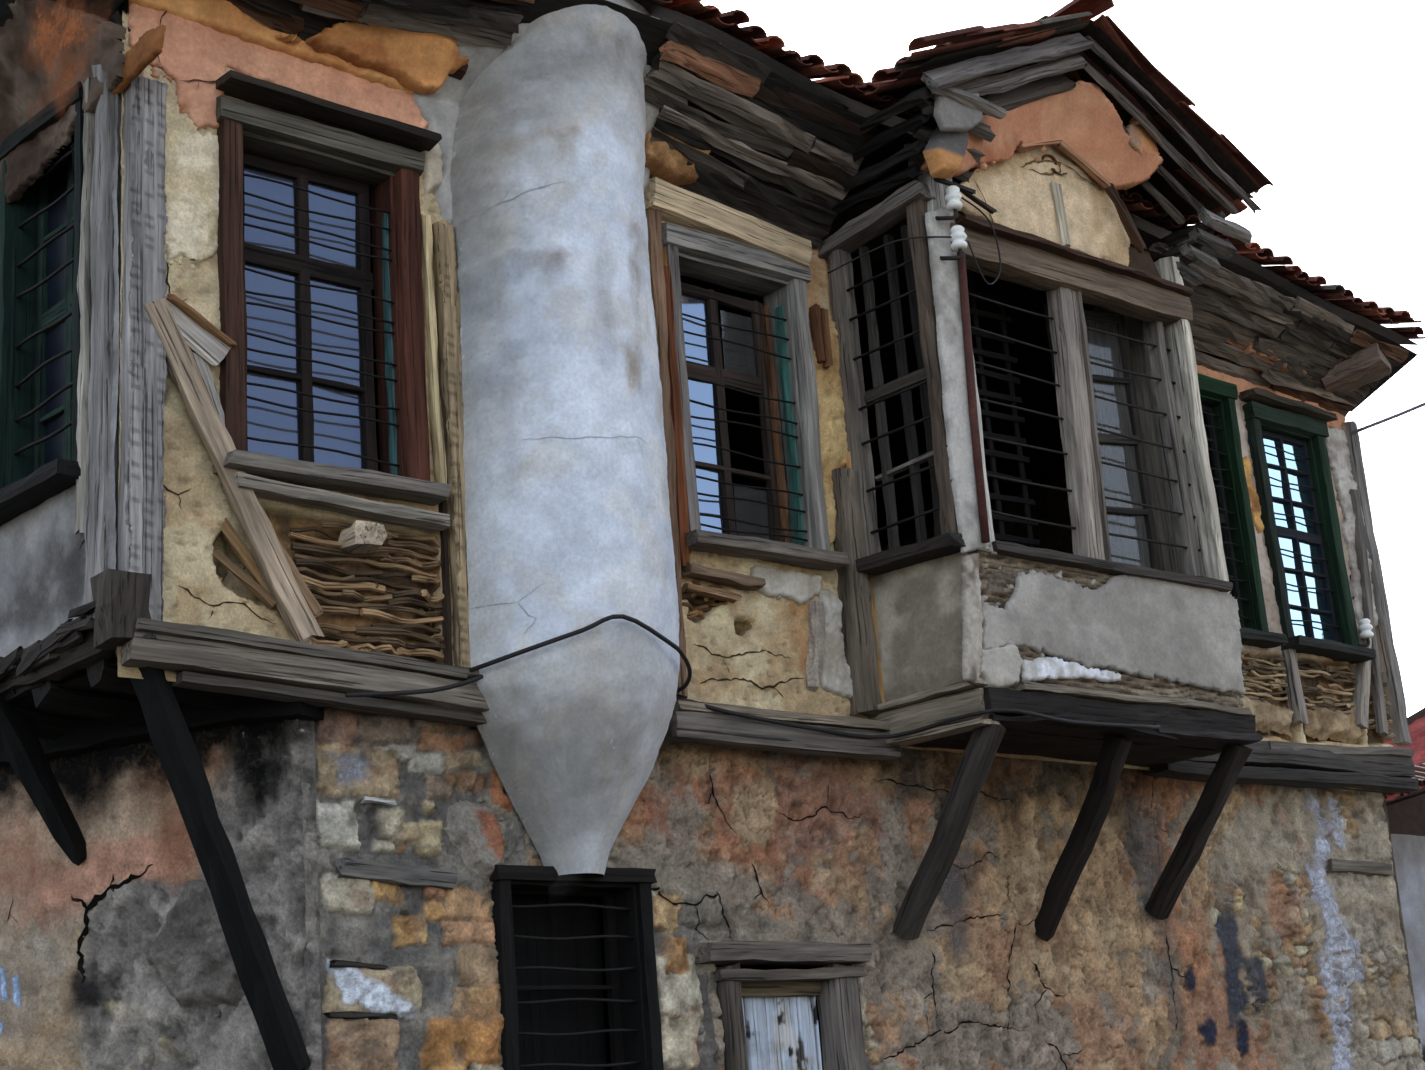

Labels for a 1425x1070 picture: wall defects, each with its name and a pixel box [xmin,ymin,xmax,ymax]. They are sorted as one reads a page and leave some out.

peeling [127,3,469,270]
peeling [645,130,711,187]
peeling [953,81,1163,190]
crack [178,585,275,624]
crack [694,644,805,698]
peeling [750,565,853,700]
peeling [979,569,1246,696]
water stain [235,726,286,805]
water stain [1327,797,1345,847]
crack [71,864,153,982]
crack [652,863,769,940]
crack [881,851,1082,1070]